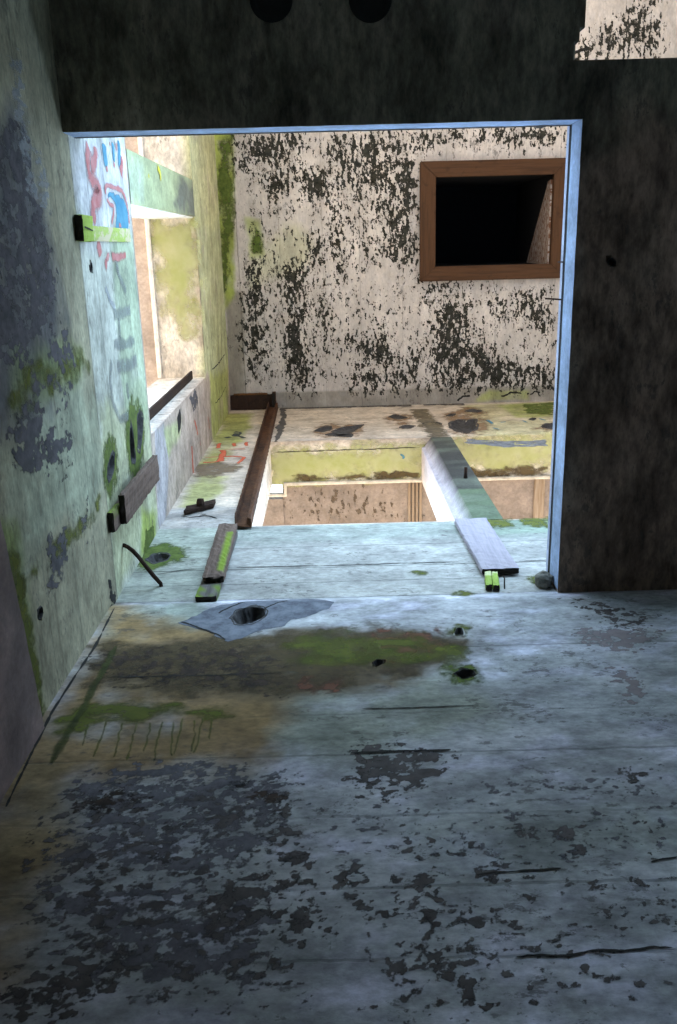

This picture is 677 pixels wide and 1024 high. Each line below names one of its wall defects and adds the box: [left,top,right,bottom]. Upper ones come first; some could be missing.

peeling [0,118,77,482]
spalling [280,403,553,448]
peeling [178,599,334,641]
leakage [81,625,466,699]
leakage [114,719,212,760]
peeling [0,737,677,1024]
crack [477,867,561,875]
crack [517,946,673,958]